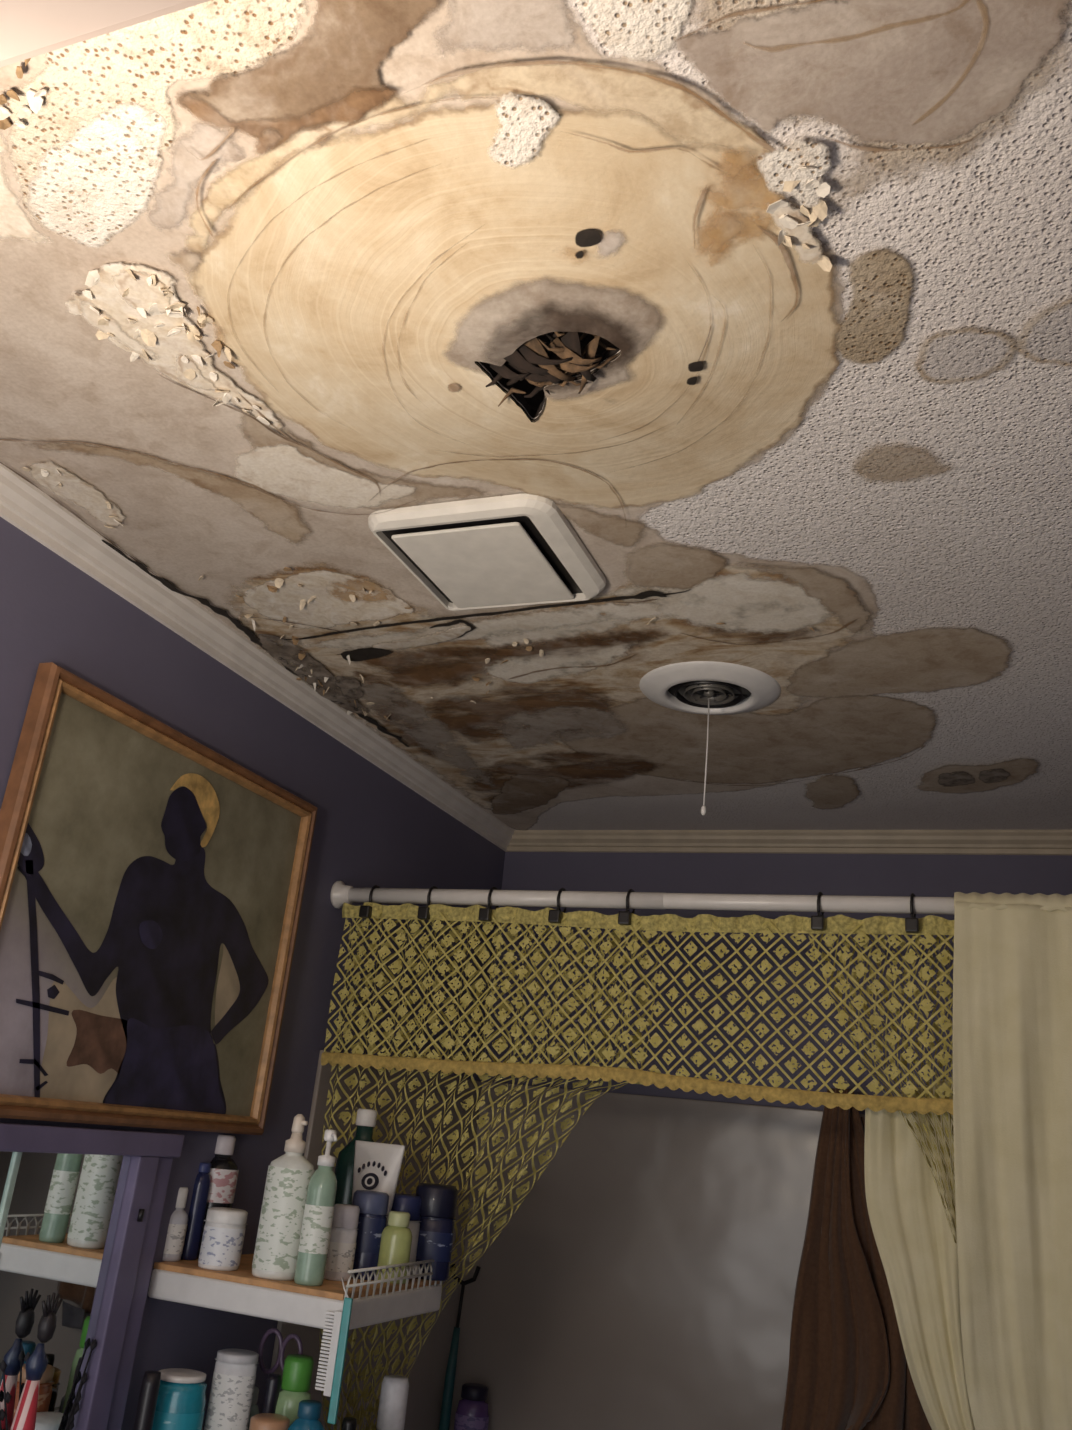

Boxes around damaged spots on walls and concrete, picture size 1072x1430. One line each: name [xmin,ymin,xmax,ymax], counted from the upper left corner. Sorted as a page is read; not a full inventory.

water stain [177,0,776,255]
peeling [311,0,1070,324]
peeling [0,0,694,658]
water stain [446,279,662,400]
water stain [835,250,913,364]
water stain [915,298,1072,384]
water stain [238,395,484,510]
peeling [736,381,828,470]
crack [102,540,691,747]
water stain [230,459,1011,815]
peeling [713,552,880,654]
peeling [339,704,787,830]